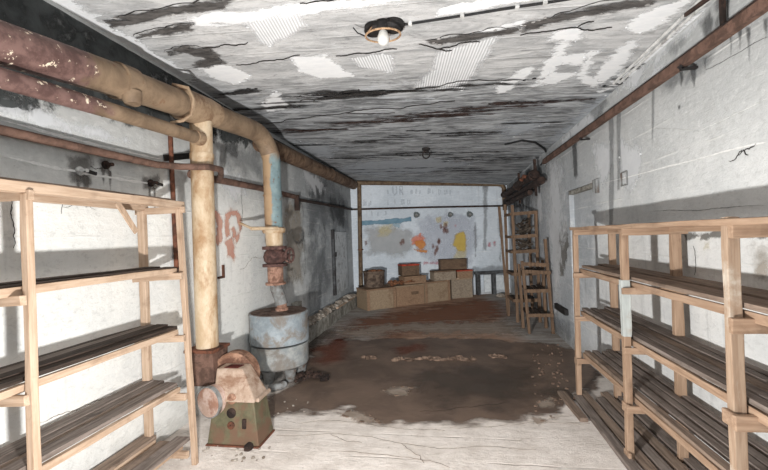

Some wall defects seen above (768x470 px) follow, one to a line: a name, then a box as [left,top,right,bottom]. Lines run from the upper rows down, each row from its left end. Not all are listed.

crack [520,21,612,36]
crack [203,42,300,66]
crack [336,48,397,57]
crack [419,41,480,52]
leakage [235,79,537,111]
leakage [271,99,595,144]
crack [601,142,767,184]
leakage [285,205,303,279]
leakage [267,330,602,425]